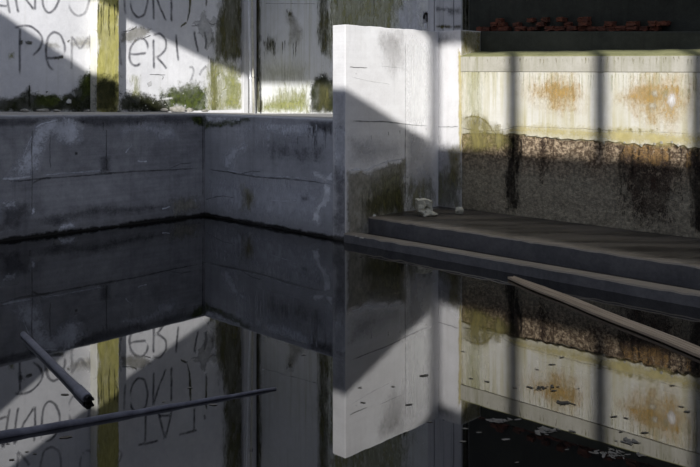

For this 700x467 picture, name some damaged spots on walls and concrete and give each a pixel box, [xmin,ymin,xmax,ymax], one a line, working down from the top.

rust [633,85,681,118]
crack [3,131,192,182]
damp [206,59,530,234]
damp [574,128,700,144]